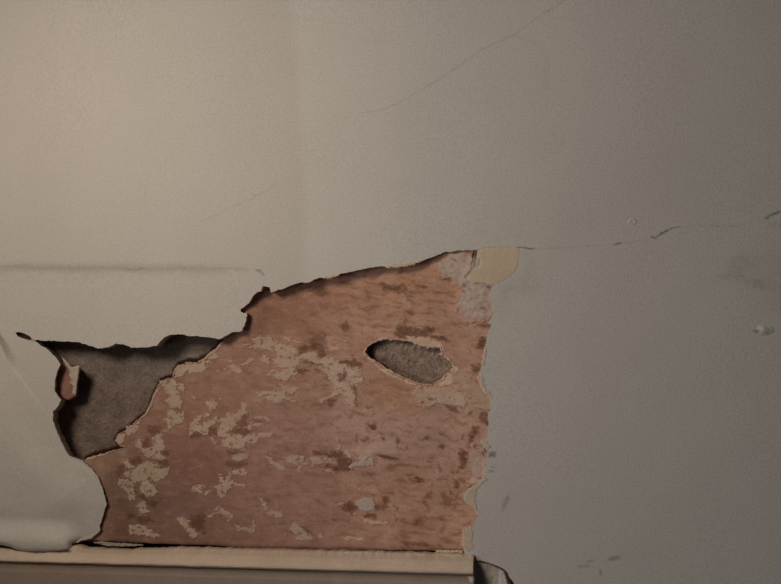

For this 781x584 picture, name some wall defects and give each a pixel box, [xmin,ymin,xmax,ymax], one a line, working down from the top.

peeling [35,248,494,554]
spalling [468,561,514,584]